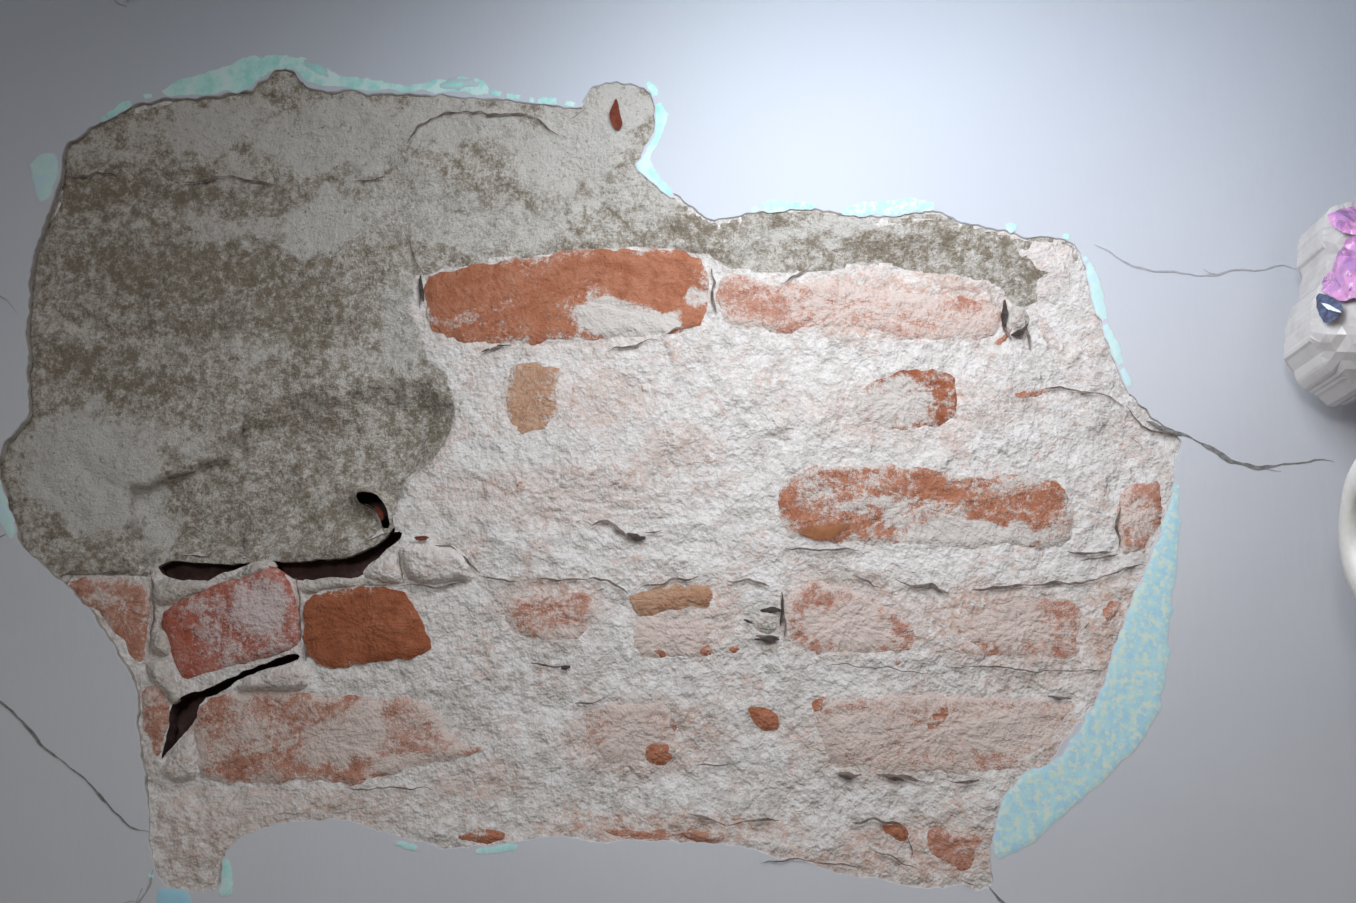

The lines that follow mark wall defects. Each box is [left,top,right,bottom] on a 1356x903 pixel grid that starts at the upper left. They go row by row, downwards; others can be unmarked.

peeling [91,54,584,126]
crack [1094,244,1294,276]
crack [1146,420,1333,472]
flaking render [0,71,1182,897]
crack [0,701,149,832]
crack [124,869,154,903]
peeling [156,887,192,903]
crack [976,886,1005,903]